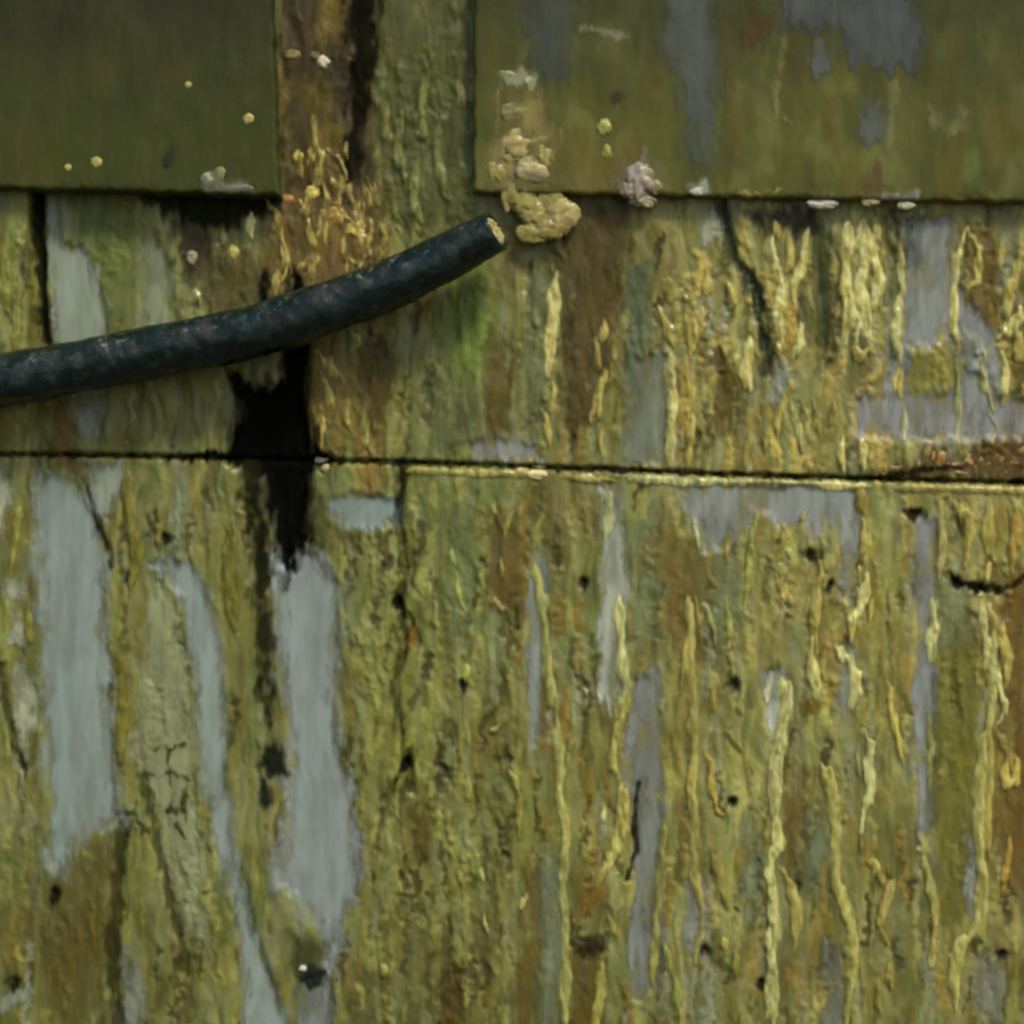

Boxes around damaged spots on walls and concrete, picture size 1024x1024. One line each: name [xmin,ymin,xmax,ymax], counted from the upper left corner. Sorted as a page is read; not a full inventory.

spalling [689,179,710,198]
spalling [806,196,841,209]
peeling [857,191,1024,482]
peeling [0,468,13,534]
leakage [169,343,374,728]
peeling [683,476,742,558]
peeling [766,480,860,566]
peeling [4,580,25,600]
crack [946,575,1024,595]
peeling [8,620,23,646]
peeling [13,459,128,873]
peeling [139,546,365,1024]